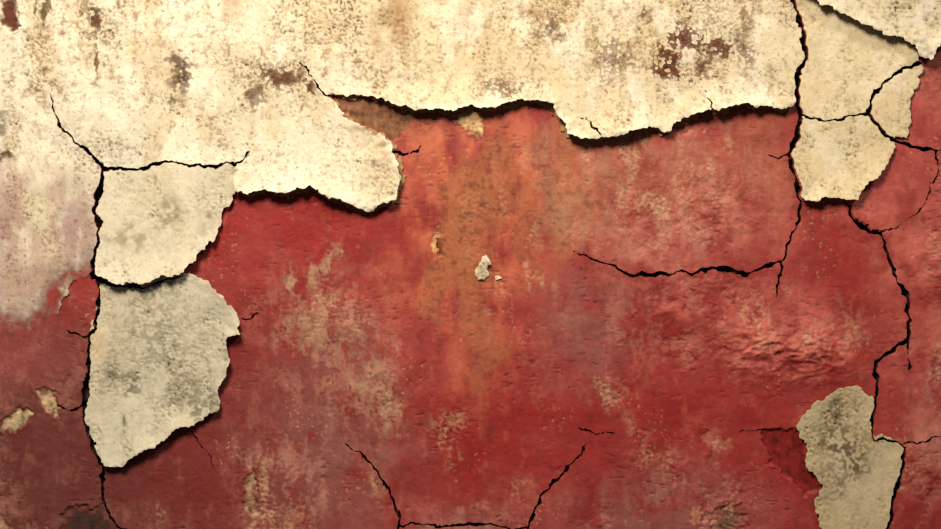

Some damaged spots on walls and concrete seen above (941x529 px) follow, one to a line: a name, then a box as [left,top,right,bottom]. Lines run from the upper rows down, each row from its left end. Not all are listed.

flaking render [66,508,110,529]
crack [60,125,250,529]
peeling [244,473,258,514]
peeling [0,0,805,467]
crack [345,428,614,529]
crack [572,0,941,287]
peeling [762,385,904,529]
peeling [791,0,941,202]
crack [847,205,935,524]